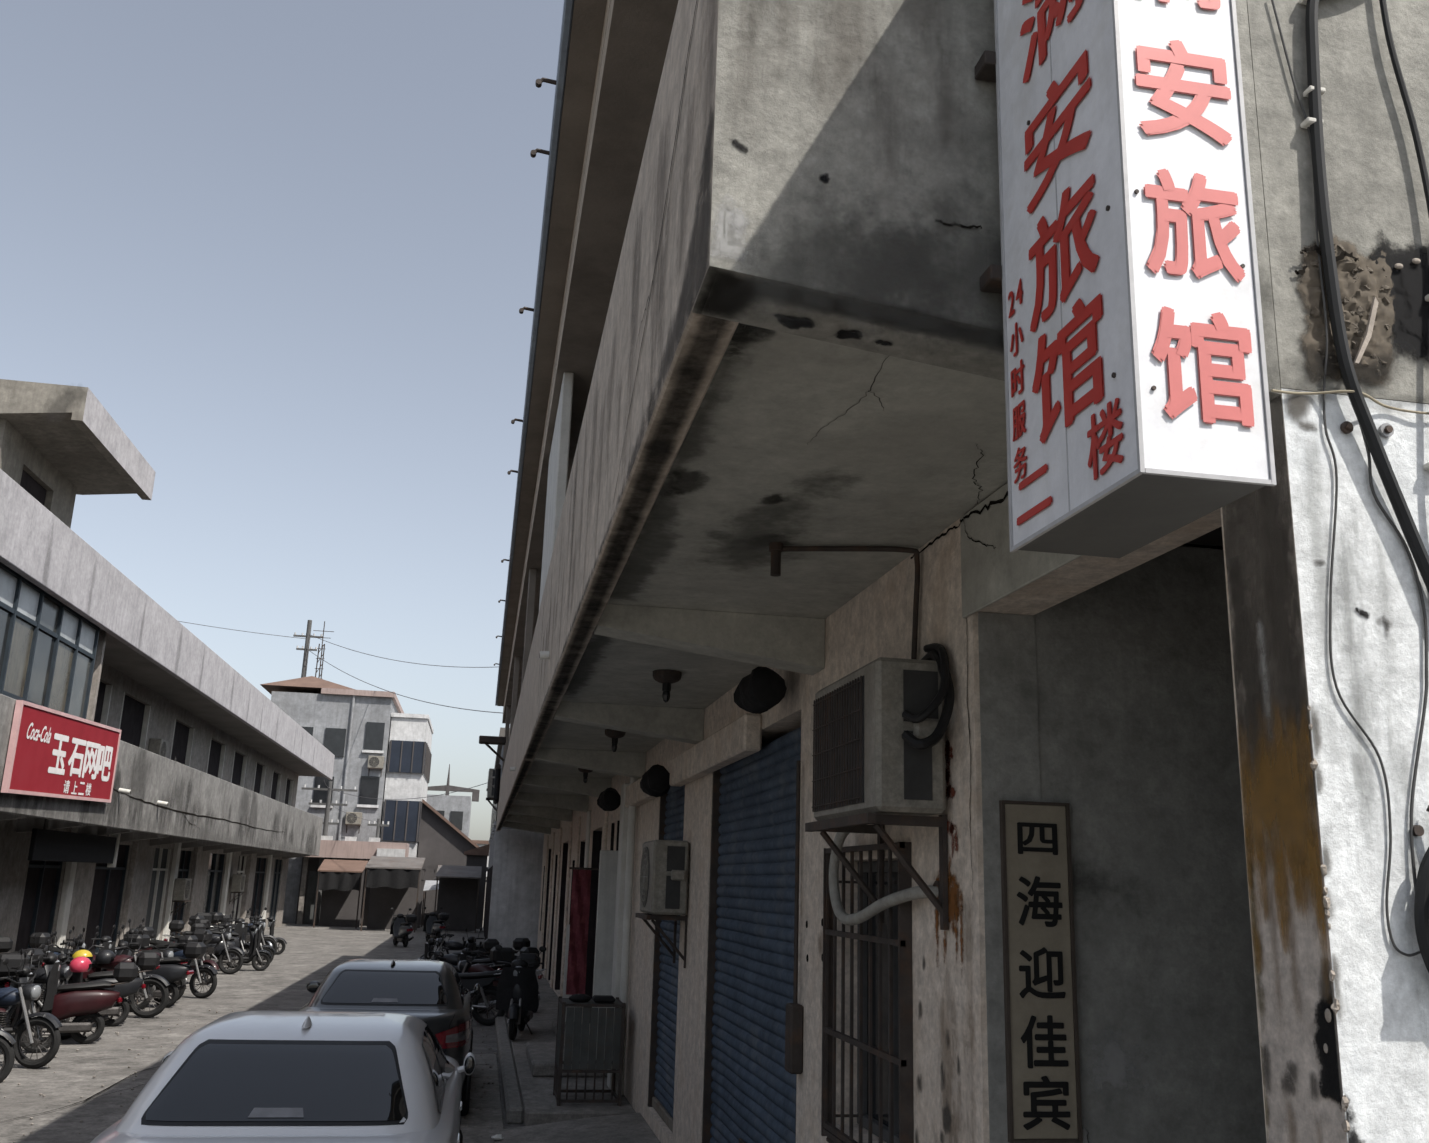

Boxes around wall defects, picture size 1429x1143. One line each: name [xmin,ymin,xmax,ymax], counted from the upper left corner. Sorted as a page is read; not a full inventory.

spalling [1294,235,1421,385]
crack [807,356,889,444]
peeling [1288,394,1316,430]
water stain [498,112,1004,830]
crack [910,449,1008,559]
spalling [1307,705,1322,791]
corrosion [1238,714,1327,950]
corrosion [935,857,963,962]
spalling [1320,848,1331,929]
peeling [1262,956,1365,1143]